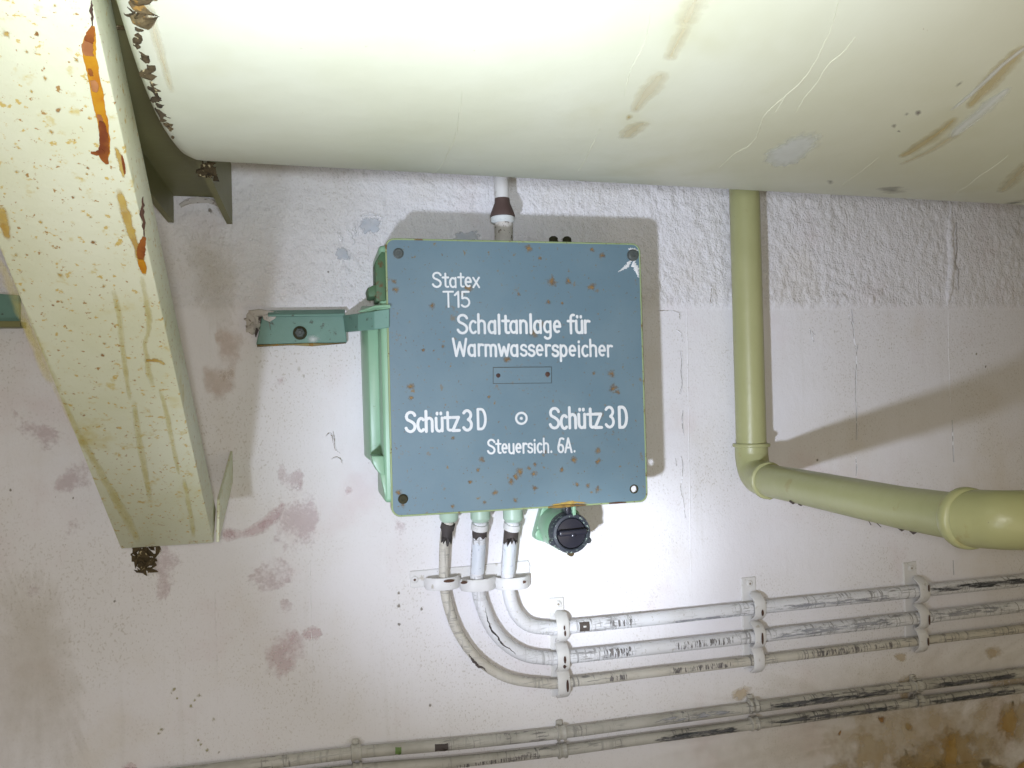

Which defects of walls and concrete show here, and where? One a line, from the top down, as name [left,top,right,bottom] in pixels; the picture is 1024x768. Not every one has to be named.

crack [720,1,855,167]
damp [771,689,898,723]